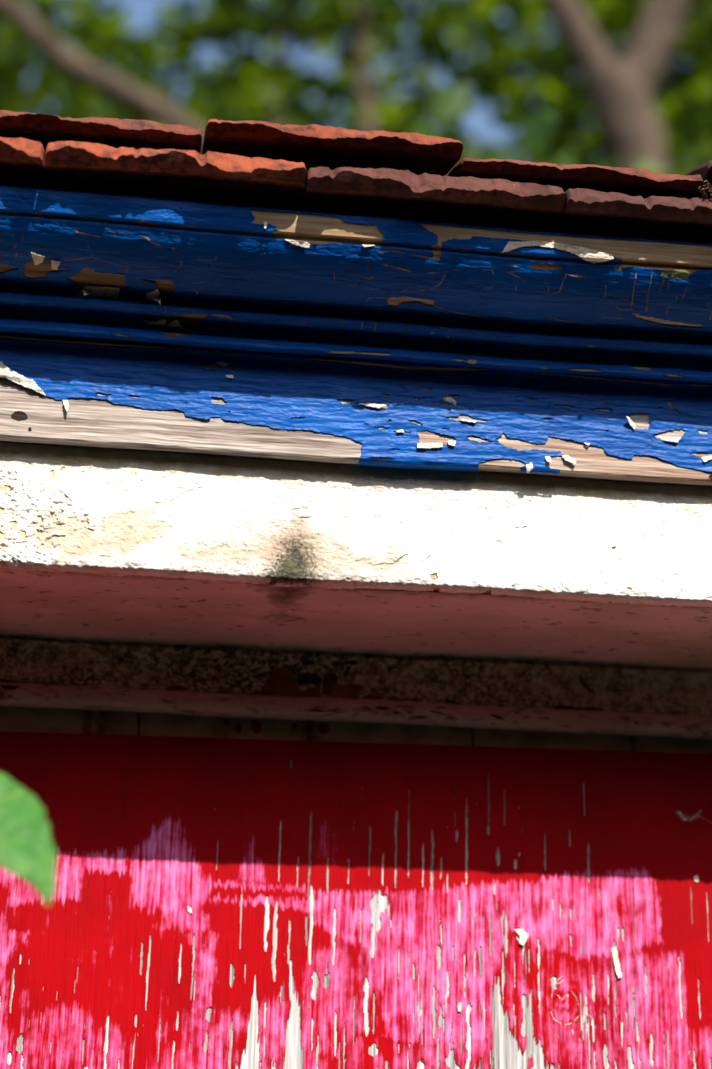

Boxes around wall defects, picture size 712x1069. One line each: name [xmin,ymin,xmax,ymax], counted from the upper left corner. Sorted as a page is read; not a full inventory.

peeling [249,209,388,248]
peeling [419,223,712,272]
peeling [0,361,400,464]
peeling [336,386,712,486]
flaking render [0,491,171,560]
water stain [181,517,399,600]
peeling [104,934,151,1069]
peeling [158,1010,179,1069]
peeling [178,933,199,1000]
peeling [226,811,337,1069]
peeling [334,791,560,1069]
peeling [577,888,670,1069]